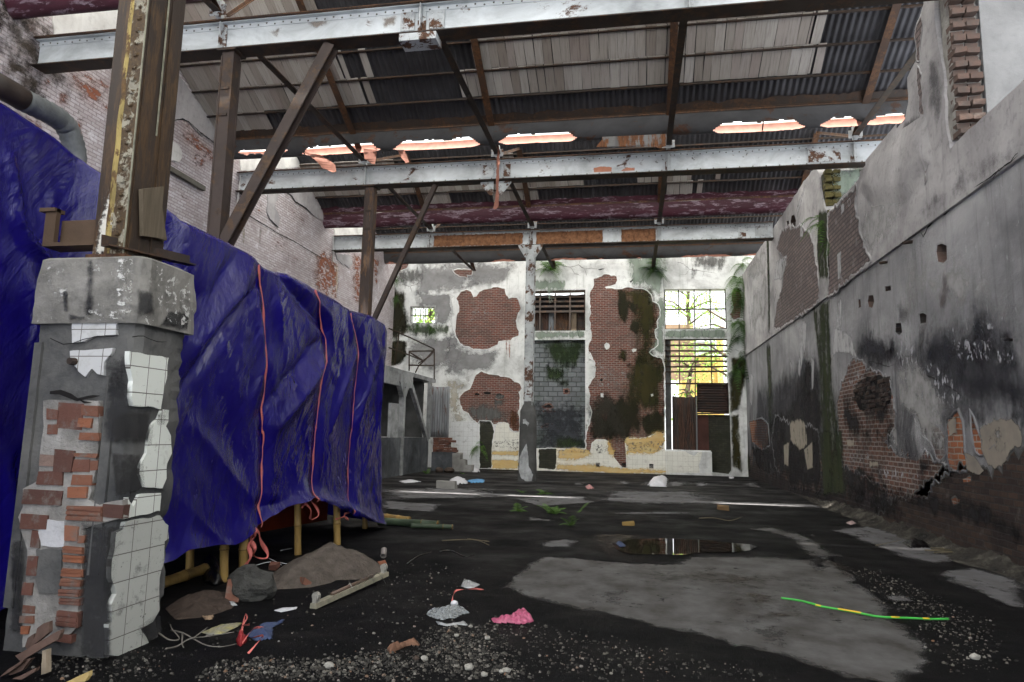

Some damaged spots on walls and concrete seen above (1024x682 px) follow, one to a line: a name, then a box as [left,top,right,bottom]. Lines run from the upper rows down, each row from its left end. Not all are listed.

spalling [0,400,130,680]
flaking render [452,268,522,350]
flaking render [459,273,666,481]
leakage [640,410,666,436]
flaking render [774,169,872,332]
leakage [790,299,929,495]
flaking render [833,357,1024,607]
leakage [897,333,961,448]
leakage [952,316,1016,369]